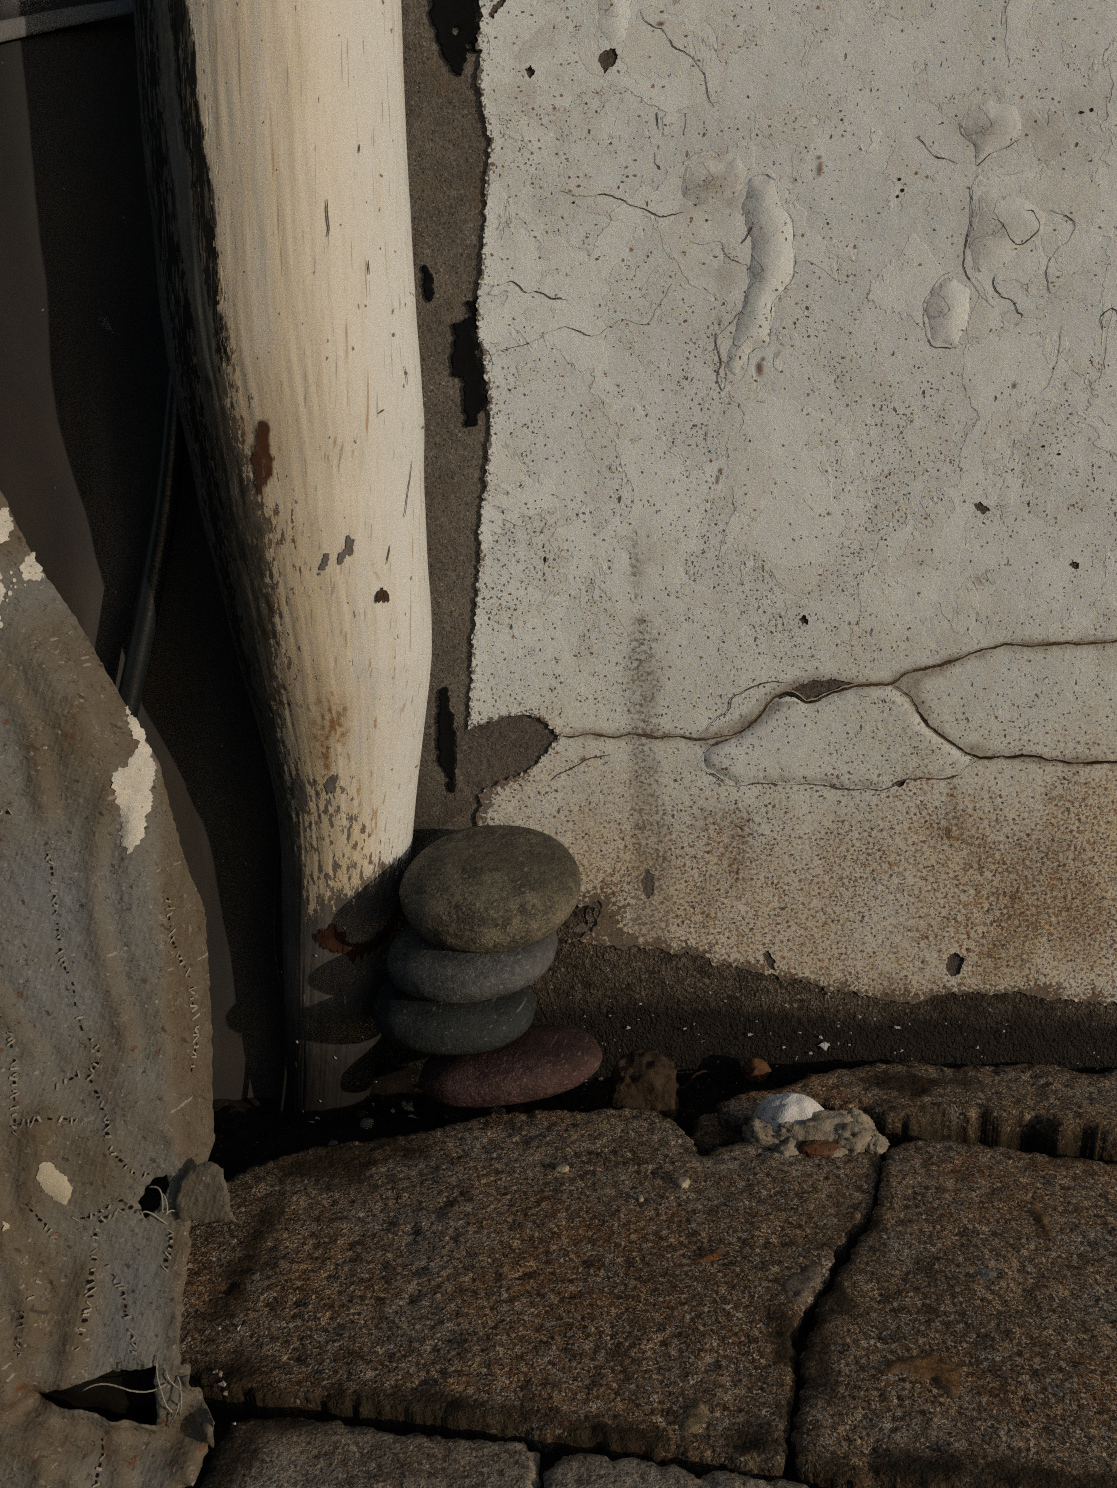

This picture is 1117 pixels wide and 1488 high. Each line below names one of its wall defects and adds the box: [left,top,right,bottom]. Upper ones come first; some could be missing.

crack [641,13,714,170]
crack [484,281,673,359]
crack [563,174,797,391]
crack [917,128,1075,349]
peeling [401,0,559,850]
crack [552,638,1117,791]
corrosion [315,901,401,964]